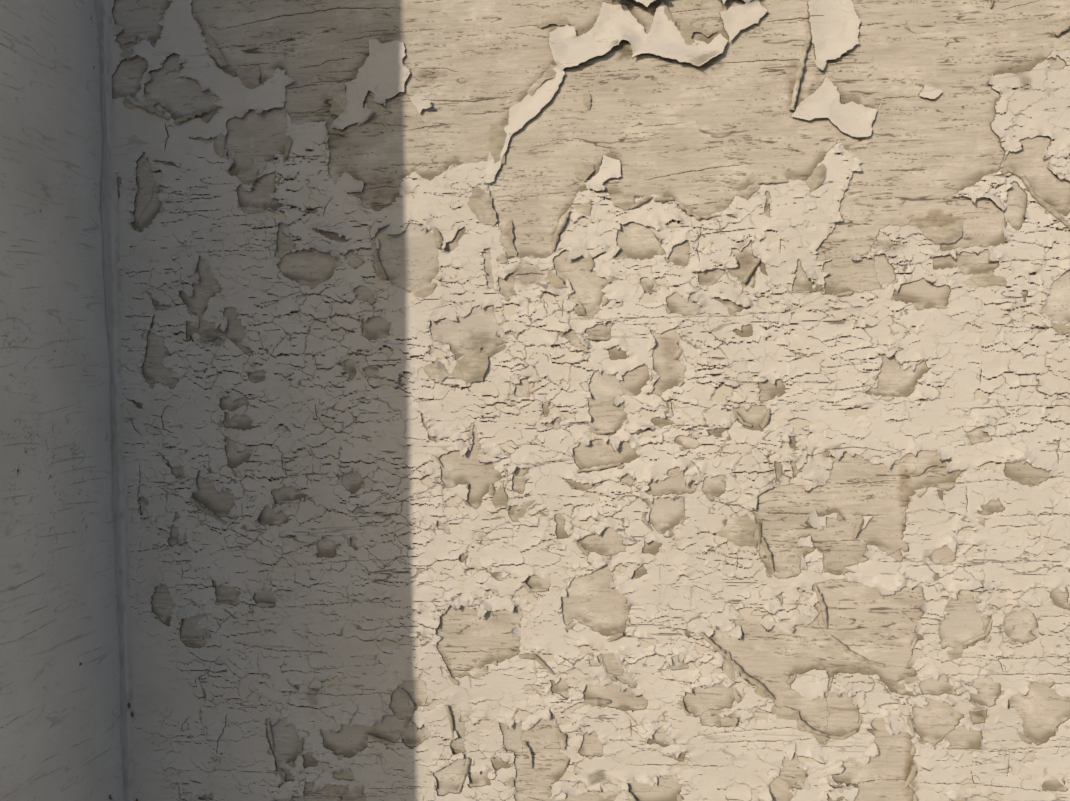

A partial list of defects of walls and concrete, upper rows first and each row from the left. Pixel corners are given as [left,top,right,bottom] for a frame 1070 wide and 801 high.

peeling [112,0,1070,389]
crack [649,164,743,180]
crack [516,273,815,323]
peeling [650,374,788,452]
peeling [861,350,930,402]
crack [957,438,1070,512]
peeling [418,326,728,801]
peeling [678,433,1070,801]
crack [924,651,1070,683]
peeling [265,677,433,801]
crack [630,726,827,768]
crack [928,742,1070,801]